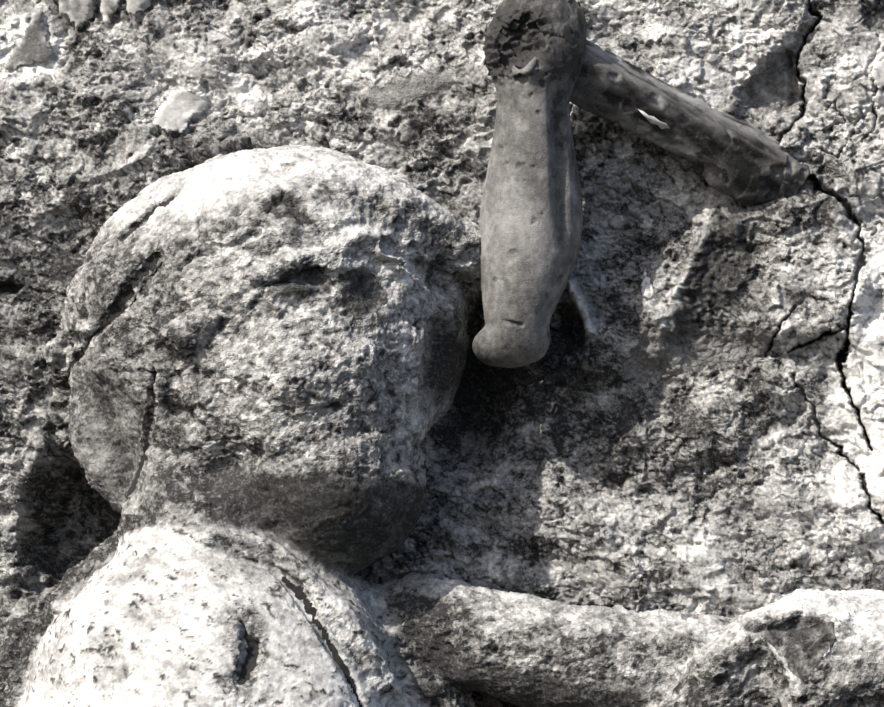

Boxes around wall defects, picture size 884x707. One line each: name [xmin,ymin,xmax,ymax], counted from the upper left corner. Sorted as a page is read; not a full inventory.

crack [795,2,822,122]
crack [823,100,846,158]
crack [126,371,157,499]
crack [765,295,872,449]
crack [824,437,884,524]
crack [281,576,363,707]